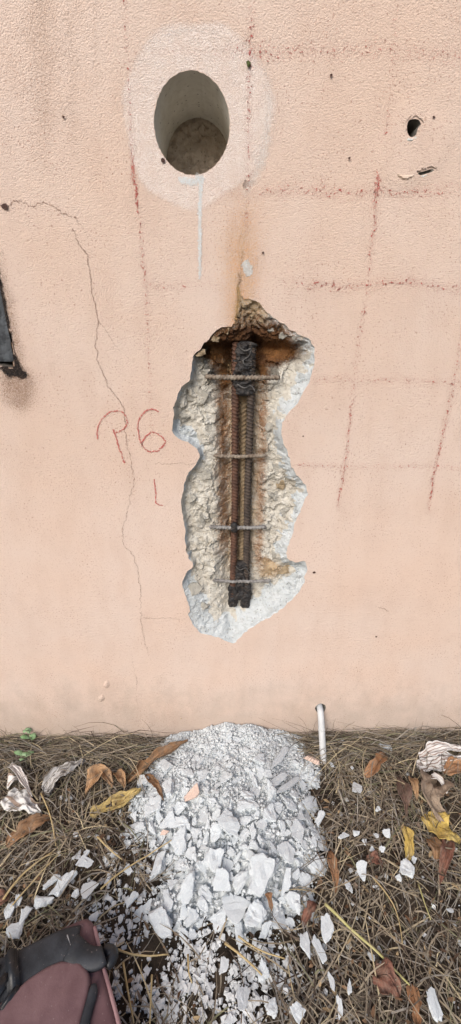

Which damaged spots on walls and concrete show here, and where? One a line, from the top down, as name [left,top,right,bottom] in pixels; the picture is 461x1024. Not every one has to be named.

spalling [172,286,316,643]
rust [201,287,311,584]